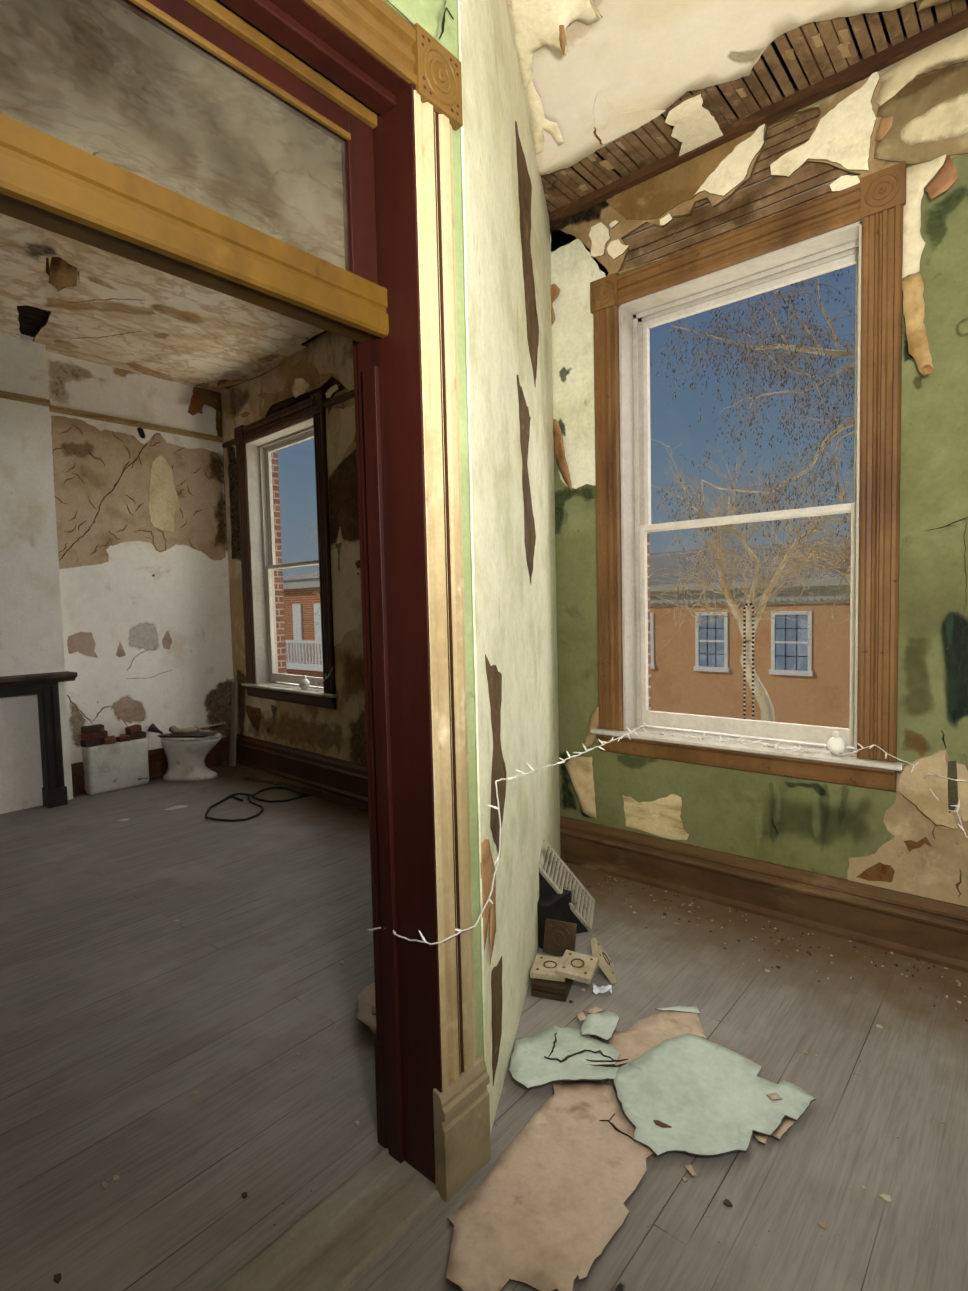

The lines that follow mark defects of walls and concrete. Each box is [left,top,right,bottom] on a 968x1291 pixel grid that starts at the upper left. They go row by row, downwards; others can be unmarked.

peeling [507,0,968,583]
crack [59,433,174,560]
crack [926,517,968,610]
flaking render [67,632,98,658]
flaking render [162,631,172,650]
flaking render [847,749,968,907]
peeling [480,654,816,1157]